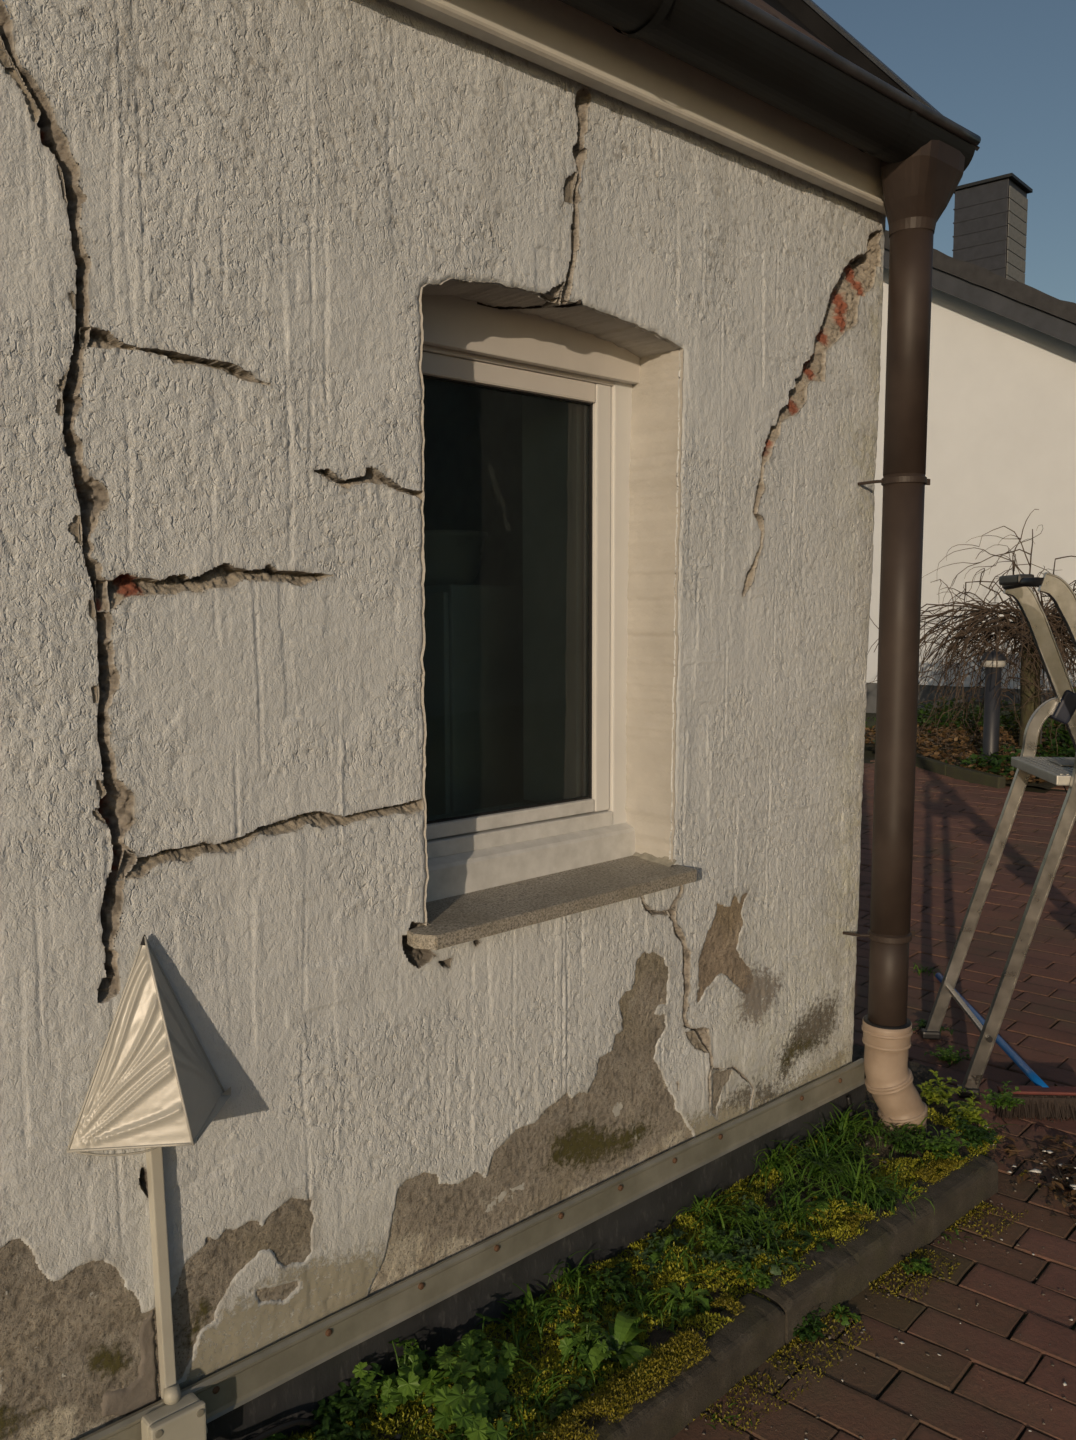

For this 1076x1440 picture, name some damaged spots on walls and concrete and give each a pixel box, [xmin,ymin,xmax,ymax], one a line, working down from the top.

crack [477,87,591,310]
crack [0,0,424,1003]
crack [742,230,882,597]
flaking render [402,921,452,969]
peeling [697,891,754,1002]
peeling [367,952,694,1298]
peeling [710,1070,731,1115]
peeling [0,1197,314,1440]